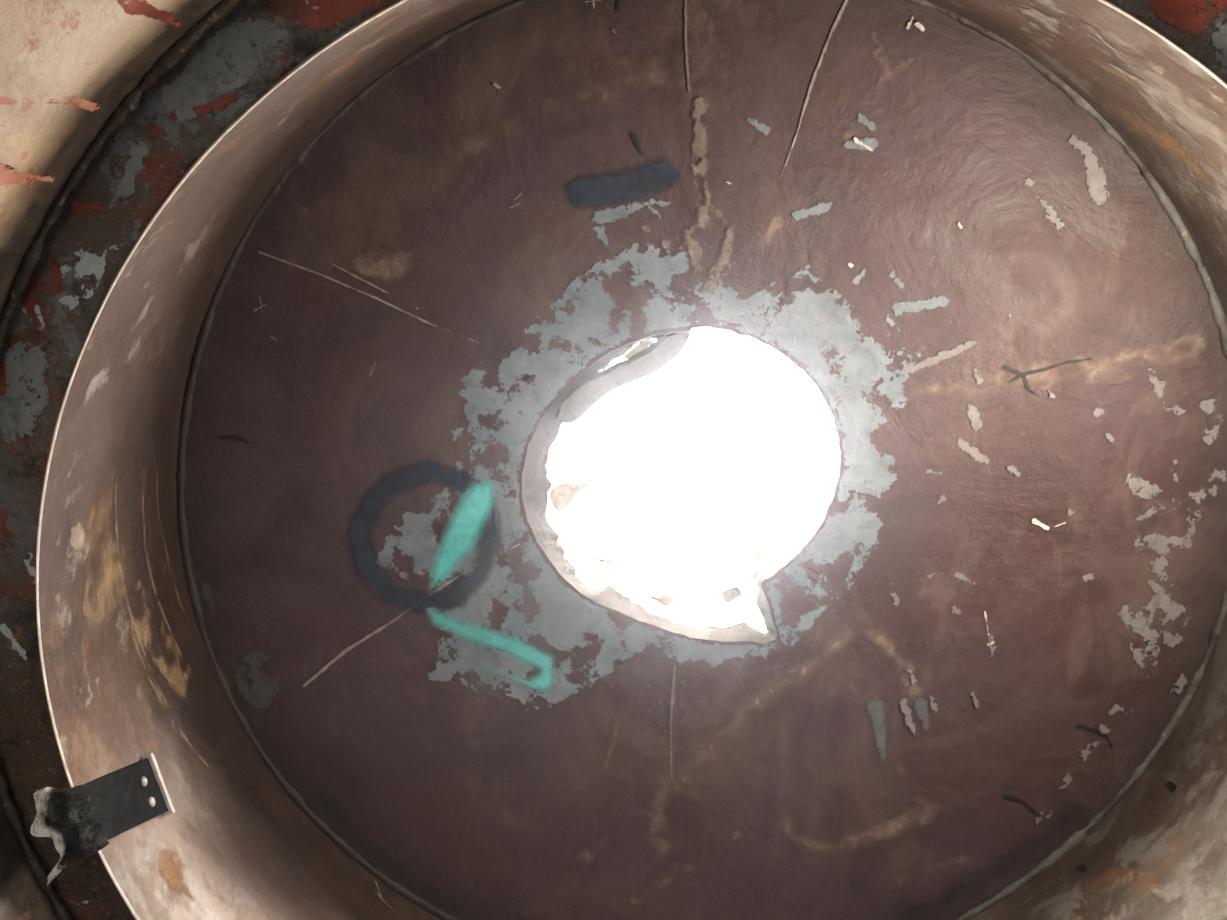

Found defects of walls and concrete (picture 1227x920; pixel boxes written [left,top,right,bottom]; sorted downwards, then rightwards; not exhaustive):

peeling [118,0,180,27]
peeling [155,0,385,126]
peeling [844,113,879,151]
peeling [59,244,123,310]
peeling [428,198,977,730]
peeling [957,404,990,464]
crack [1003,358,1093,396]
peeling [1148,368,1223,452]
peeling [376,486,482,594]
spalling [1032,508,1076,530]
peeling [1117,469,1227,678]
corrosion [160,851,191,898]